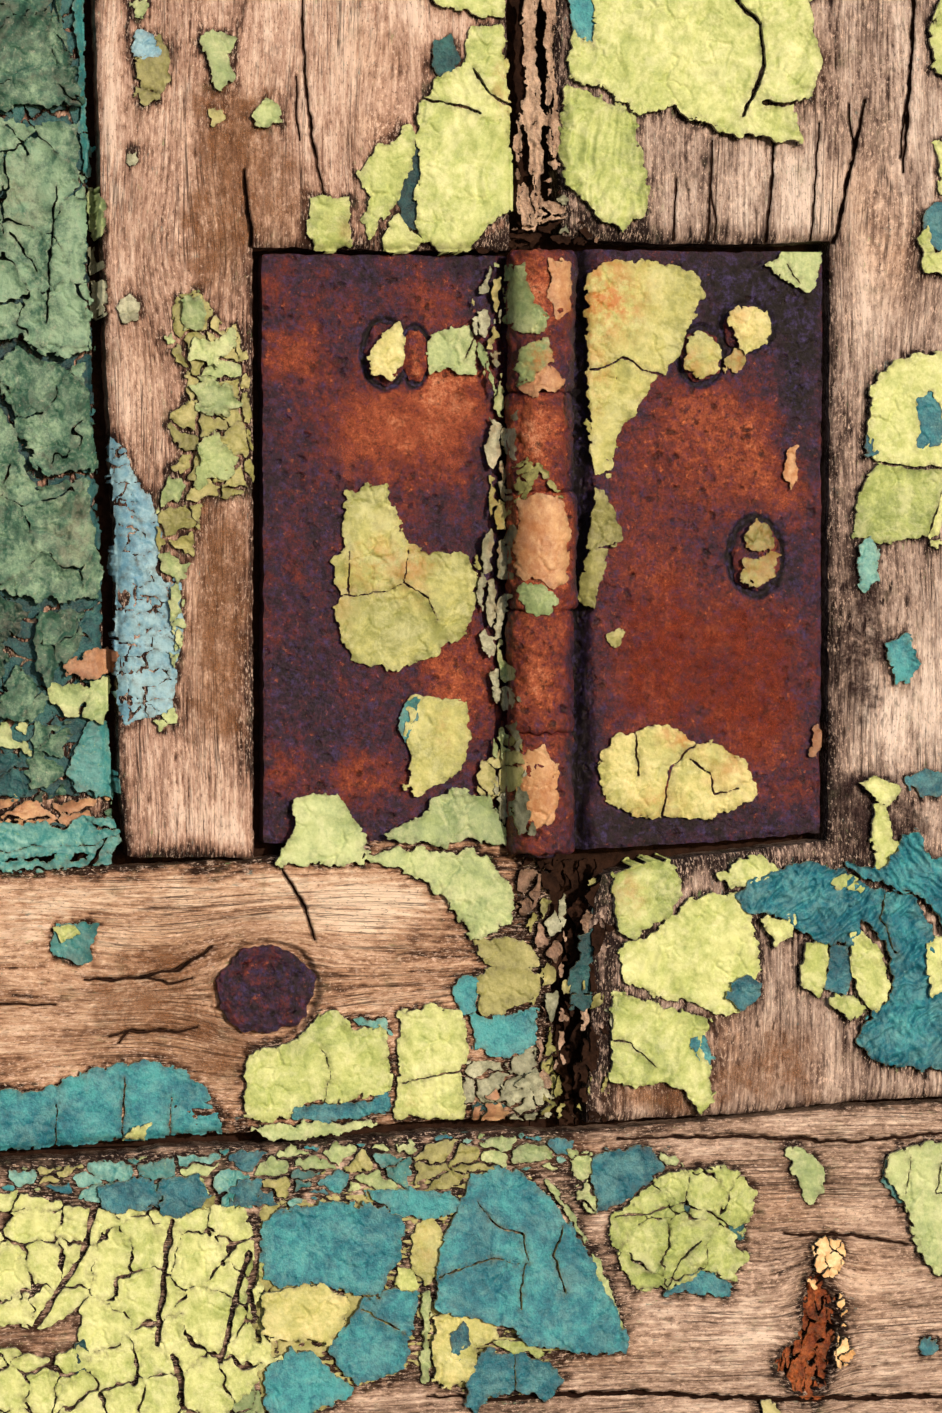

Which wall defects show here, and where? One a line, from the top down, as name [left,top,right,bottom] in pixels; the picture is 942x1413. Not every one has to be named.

peeling [0,0,255,874]
peeling [306,0,823,711]
peeling [851,350,942,593]
corrosion [100,951,213,1039]
crack [280,868,316,941]
peeling [0,694,942,1413]